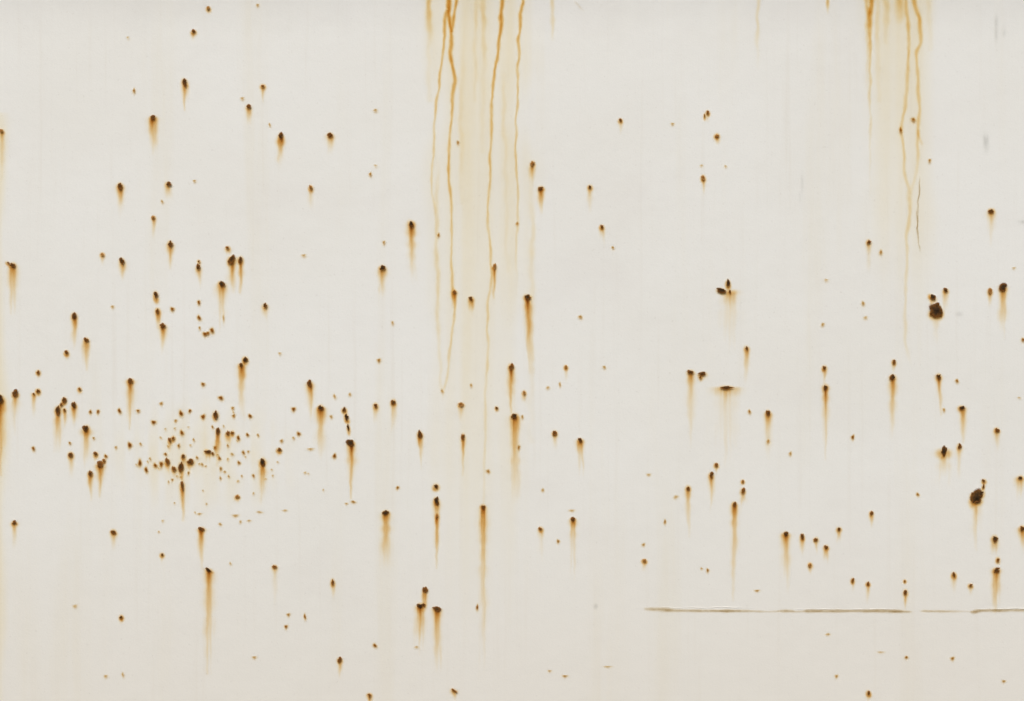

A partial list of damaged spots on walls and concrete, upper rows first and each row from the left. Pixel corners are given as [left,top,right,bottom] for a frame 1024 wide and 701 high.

rust [929,288,948,317]
rust [138,410,258,491]
rust [970,479,985,503]